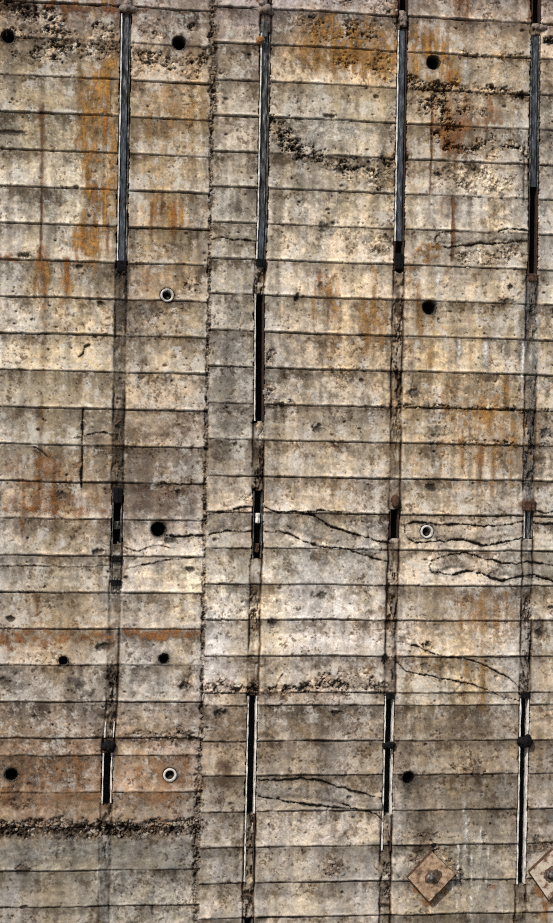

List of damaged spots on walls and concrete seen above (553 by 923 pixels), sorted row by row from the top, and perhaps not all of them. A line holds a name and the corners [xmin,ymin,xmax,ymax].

spalling [0,0,210,81]
corrosion [301,17,397,81]
corrosion [63,59,118,297]
spalling [269,113,412,193]
spalling [407,74,530,200]
spalling [362,232,394,256]
crack [435,228,527,248]
crack [125,506,553,582]
spalling [200,668,391,697]
crack [391,644,527,700]
spalling [0,784,208,840]
crack [259,777,383,821]